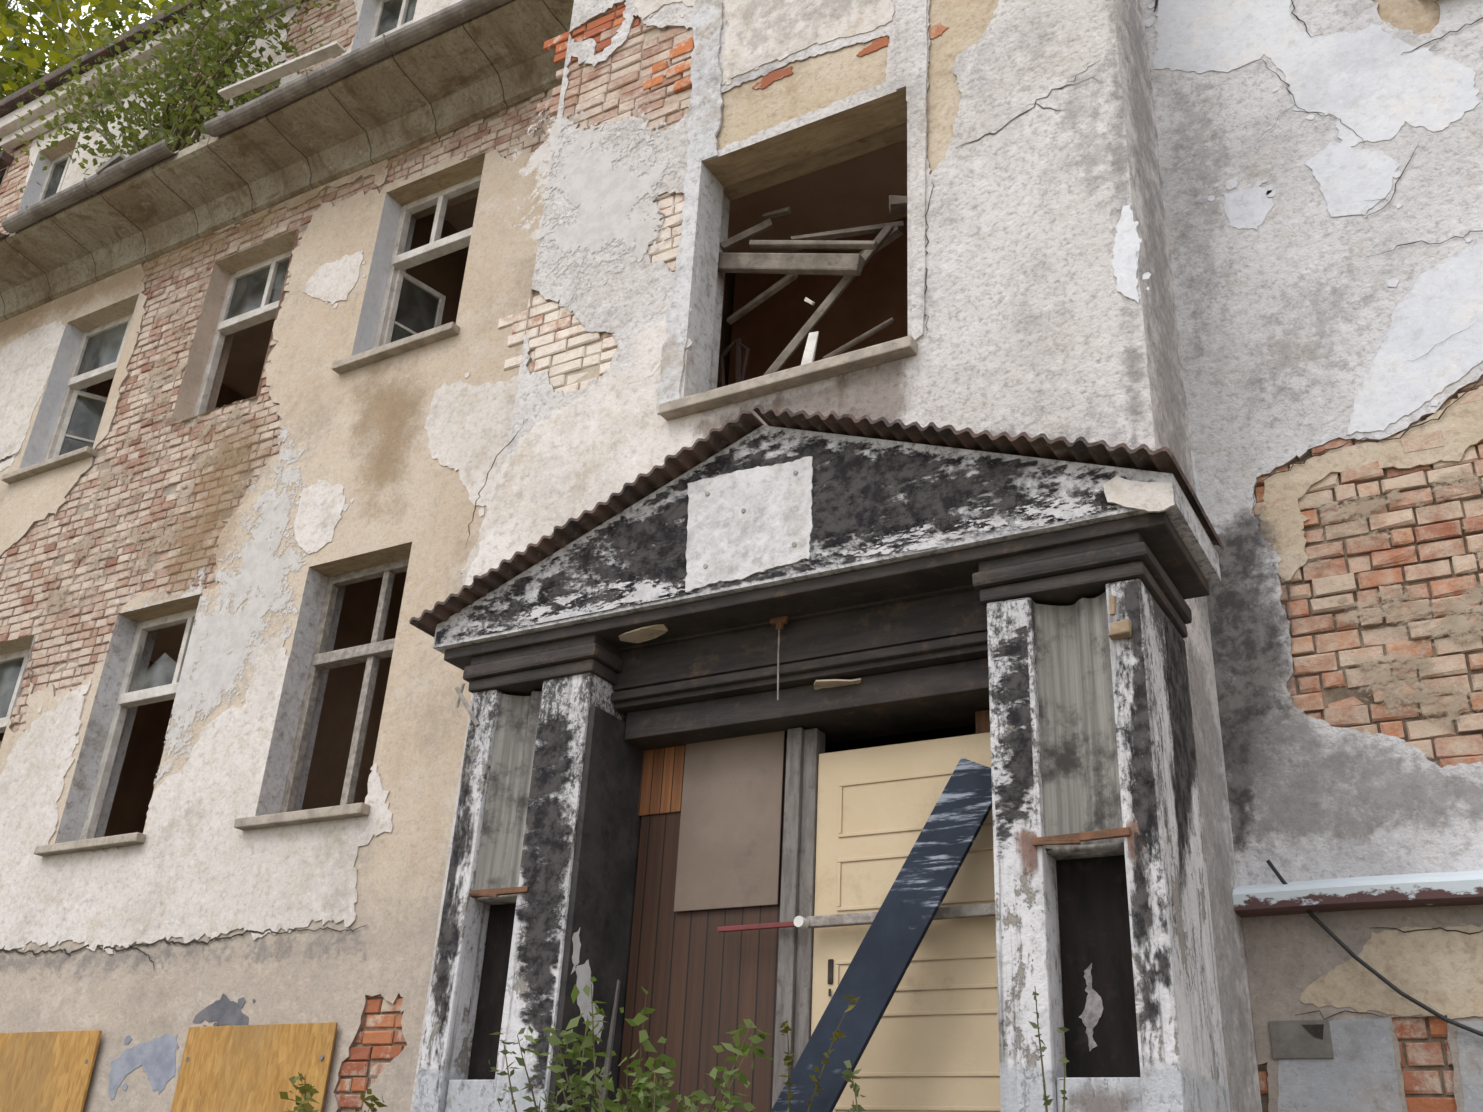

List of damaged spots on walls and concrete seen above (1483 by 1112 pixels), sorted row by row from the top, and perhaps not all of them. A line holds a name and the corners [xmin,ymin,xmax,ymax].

crack [1291,0,1322,37]
crack [1402,17,1483,54]
crack [956,61,1099,148]
flaking render [0,0,722,954]
damp [803,493,1102,573]
flaking render [1252,237,1483,768]
damp [448,577,685,641]
damp [1188,512,1483,1112]
crack [0,925,366,966]
damp [1130,751,1172,1067]
flaking render [333,993,407,1112]
flaking render [1300,924,1483,1112]